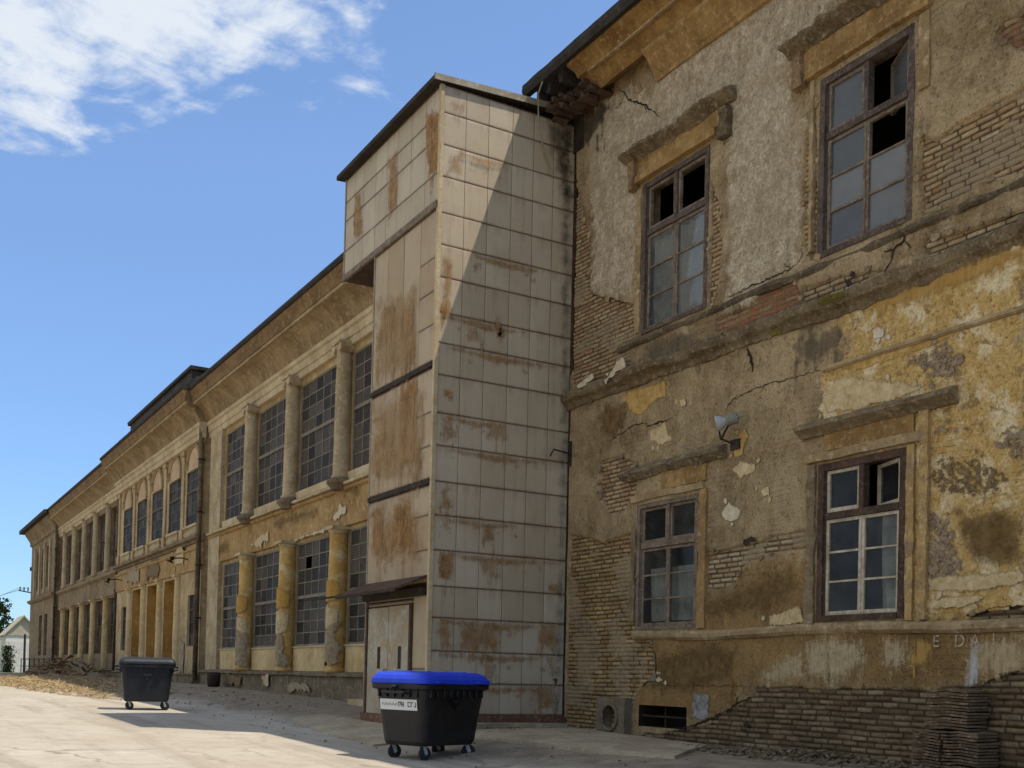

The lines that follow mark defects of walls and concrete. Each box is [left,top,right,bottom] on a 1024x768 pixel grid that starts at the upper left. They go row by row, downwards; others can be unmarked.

crack [616,87,659,117]
corrosion [426,112,460,187]
spalling [914,90,1024,214]
spalling [572,190,640,390]
crack [727,254,802,298]
crack [884,236,911,272]
crack [725,348,821,411]
spalling [931,449,1008,497]
corrosion [370,501,410,554]
peeling [719,498,741,526]
leakage [959,511,1020,563]
peeling [915,512,1024,620]